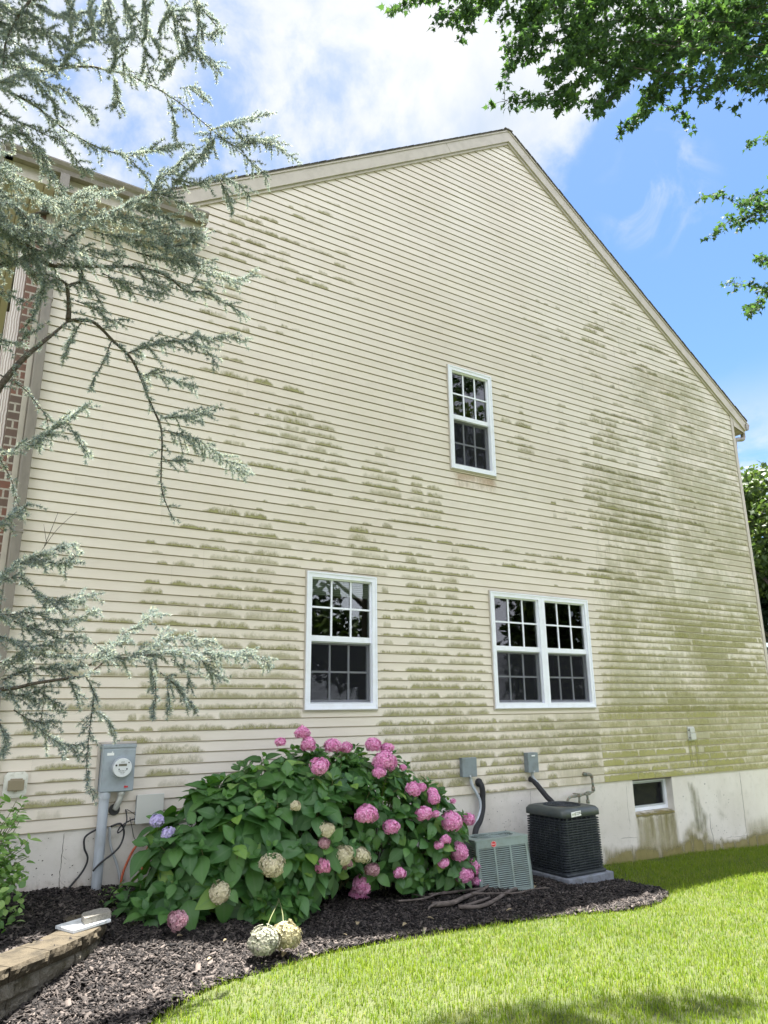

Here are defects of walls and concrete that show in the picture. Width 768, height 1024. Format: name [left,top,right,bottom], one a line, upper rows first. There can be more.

leakage [606,833,768,865]